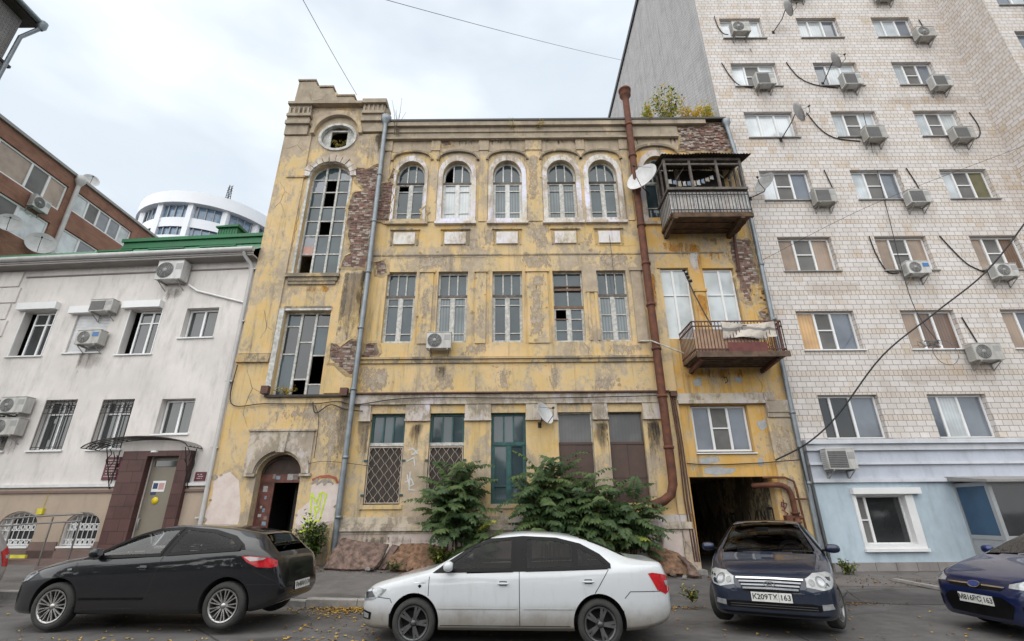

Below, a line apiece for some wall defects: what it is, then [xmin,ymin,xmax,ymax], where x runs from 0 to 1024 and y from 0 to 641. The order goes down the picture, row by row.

flaking render [676,122,732,154]
flaking render [339,137,399,278]
flaking render [726,236,770,323]
flaking render [326,336,394,392]
flaking render [203,472,241,525]